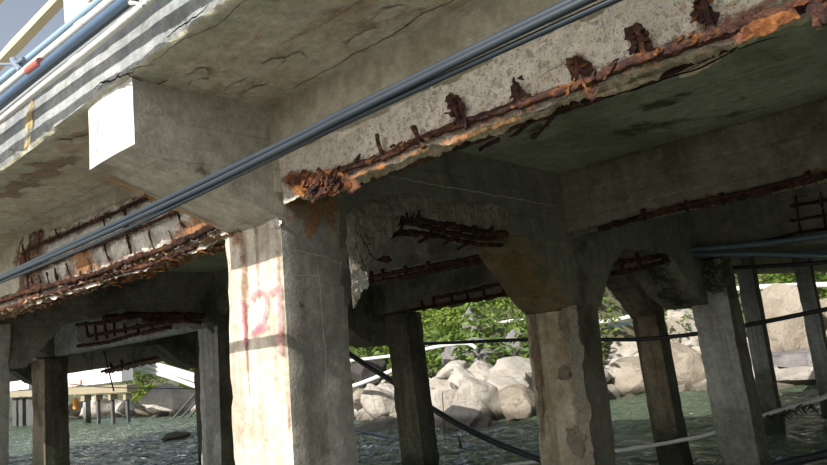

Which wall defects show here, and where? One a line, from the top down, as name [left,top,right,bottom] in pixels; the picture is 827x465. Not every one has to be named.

crack [94,0,246,156]
crack [296,0,453,87]
rust [443,92,465,118]
rust [509,75,524,101]
spalling [279,0,827,205]
rust [565,53,599,95]
rust [624,22,658,55]
rust [689,0,827,44]
spalling [0,193,242,320]
rust [173,208,218,234]
spalling [345,194,509,312]
spalling [597,170,827,246]